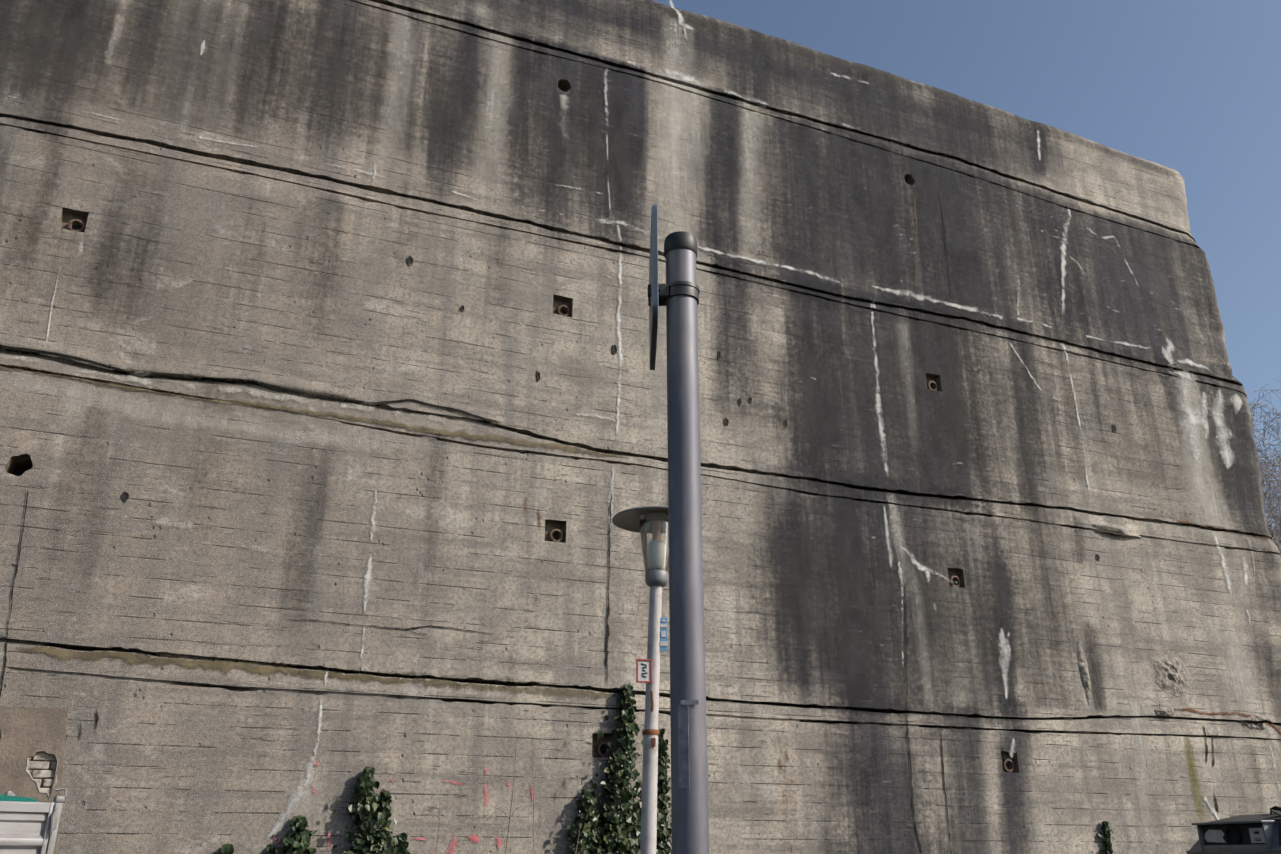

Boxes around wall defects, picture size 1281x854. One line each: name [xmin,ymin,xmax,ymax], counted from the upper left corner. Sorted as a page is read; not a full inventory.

damp [0,0,388,123]
crack [0,346,499,425]
damp [430,0,1264,854]
crack [0,491,28,696]
damp [357,491,377,682]
spalling [25,750,58,800]
damp [268,668,329,837]